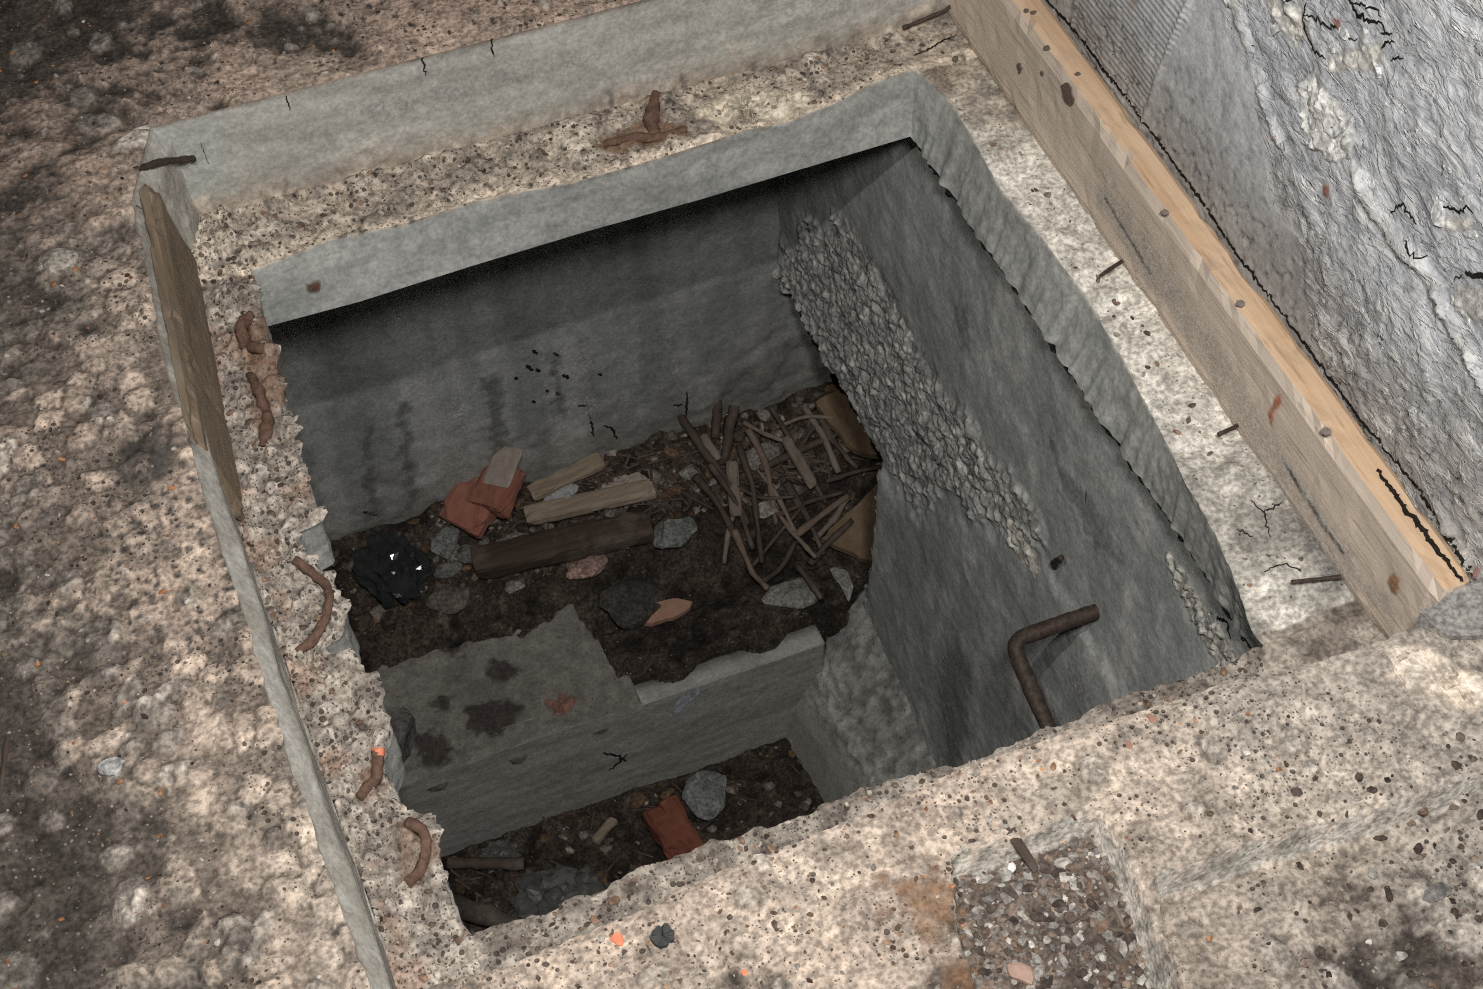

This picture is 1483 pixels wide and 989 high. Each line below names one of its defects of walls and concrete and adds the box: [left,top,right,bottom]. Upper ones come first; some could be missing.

crack [914,34,957,56]
crack [1046,0,1483,577]
spalling [234,137,1252,769]
spalling [355,747,385,801]
spalling [403,817,432,888]